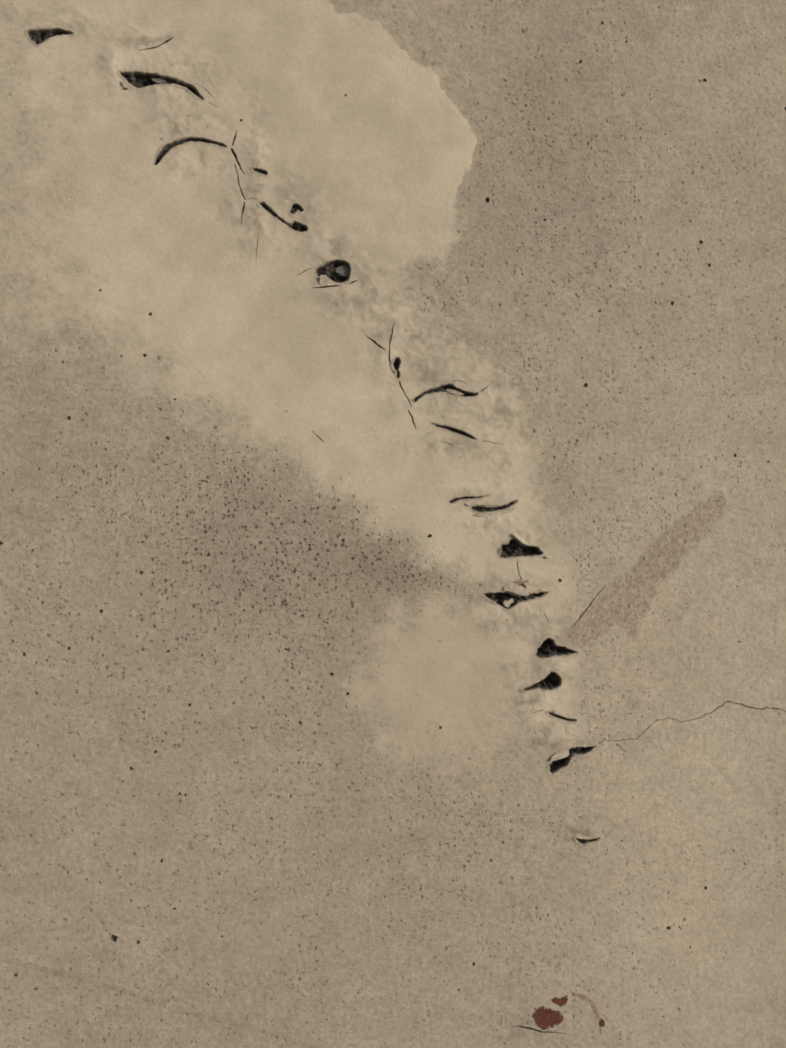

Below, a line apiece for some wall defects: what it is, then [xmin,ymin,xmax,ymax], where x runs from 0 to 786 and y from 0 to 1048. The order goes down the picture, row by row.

crack [231,132,259,262]
crack [367,325,416,428]
crack [598,701,786,752]
rust [528,984,611,1032]